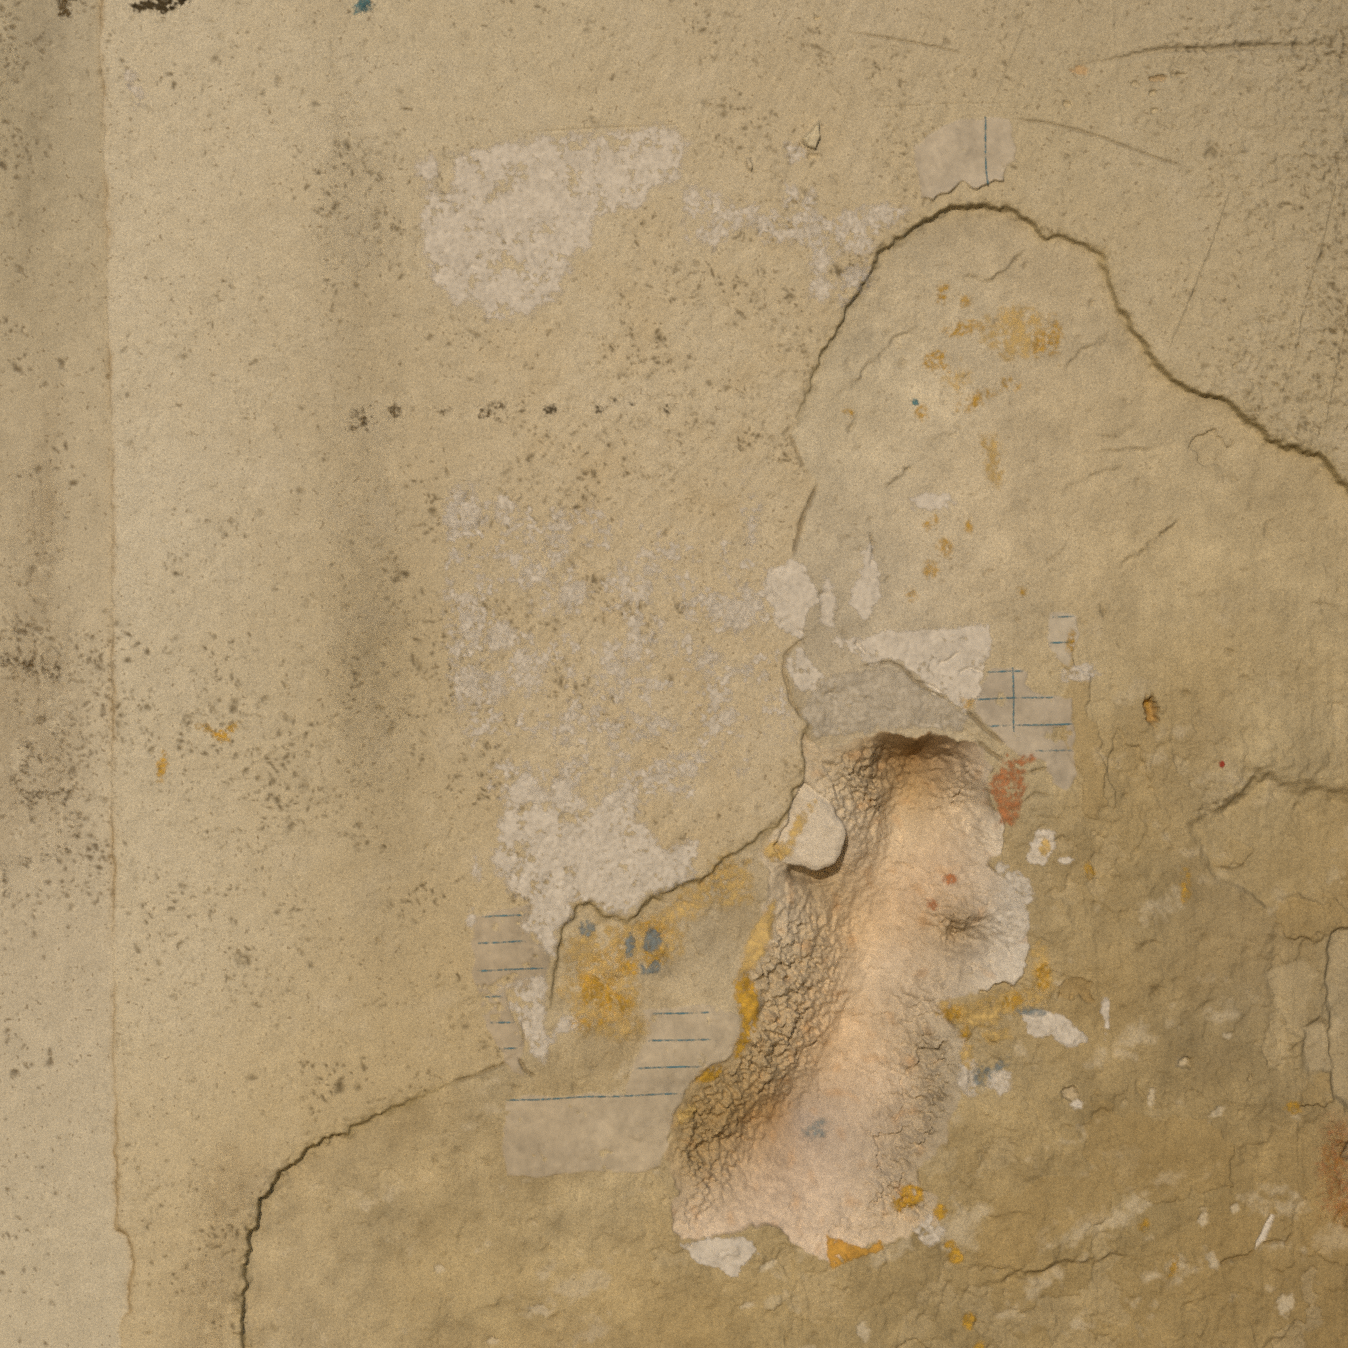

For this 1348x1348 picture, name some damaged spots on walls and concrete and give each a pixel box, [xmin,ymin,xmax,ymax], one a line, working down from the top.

crack [789,433,820,561]
spalling [241,122,1348,1348]
crack [783,636,1054,805]
crack [450,1018,537,1085]